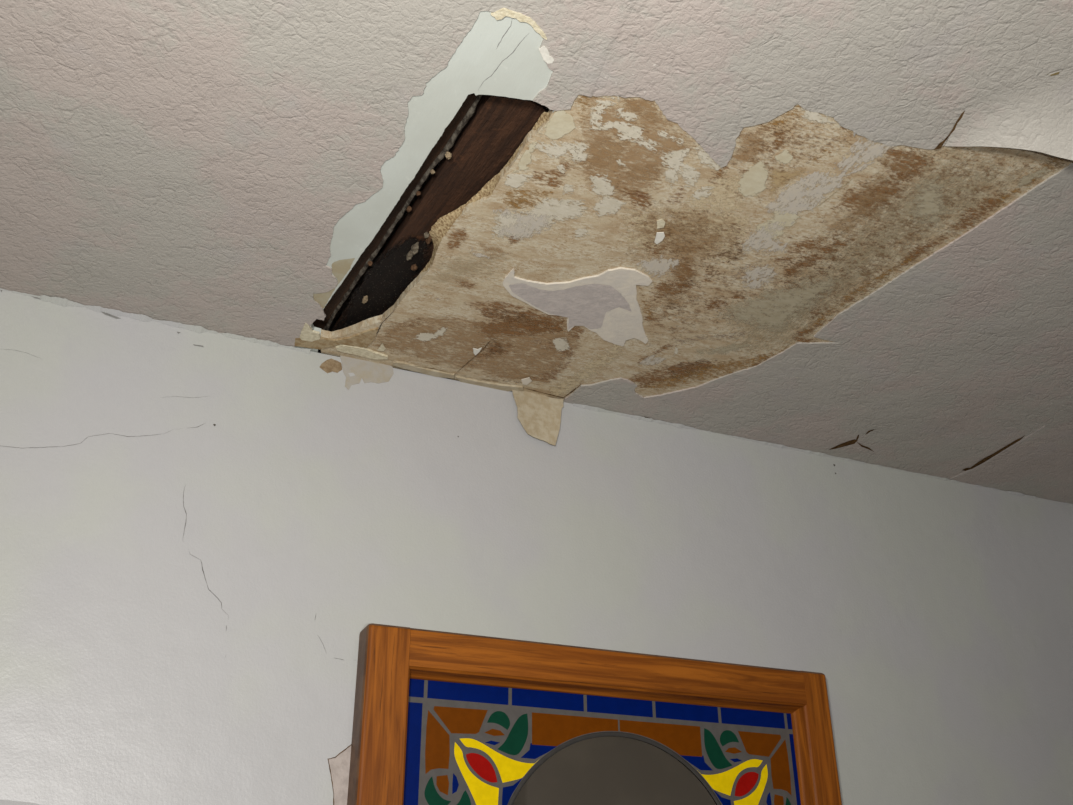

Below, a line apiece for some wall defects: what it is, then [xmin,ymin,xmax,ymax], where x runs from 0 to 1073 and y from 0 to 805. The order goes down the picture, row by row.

peeling [295,8,1073,446]
crack [950,426,1045,479]